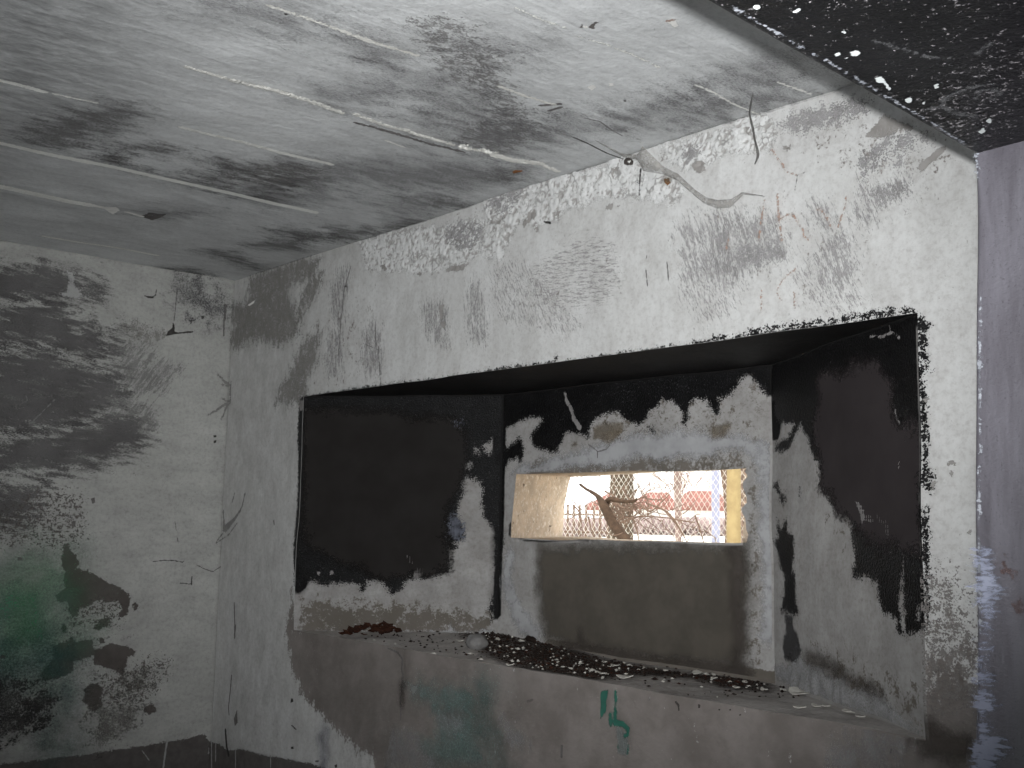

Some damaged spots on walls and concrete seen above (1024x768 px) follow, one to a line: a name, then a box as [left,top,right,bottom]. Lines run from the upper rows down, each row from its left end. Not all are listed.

peeling [230,93,978,730]
damp [0,675,63,750]
damp [80,665,156,746]